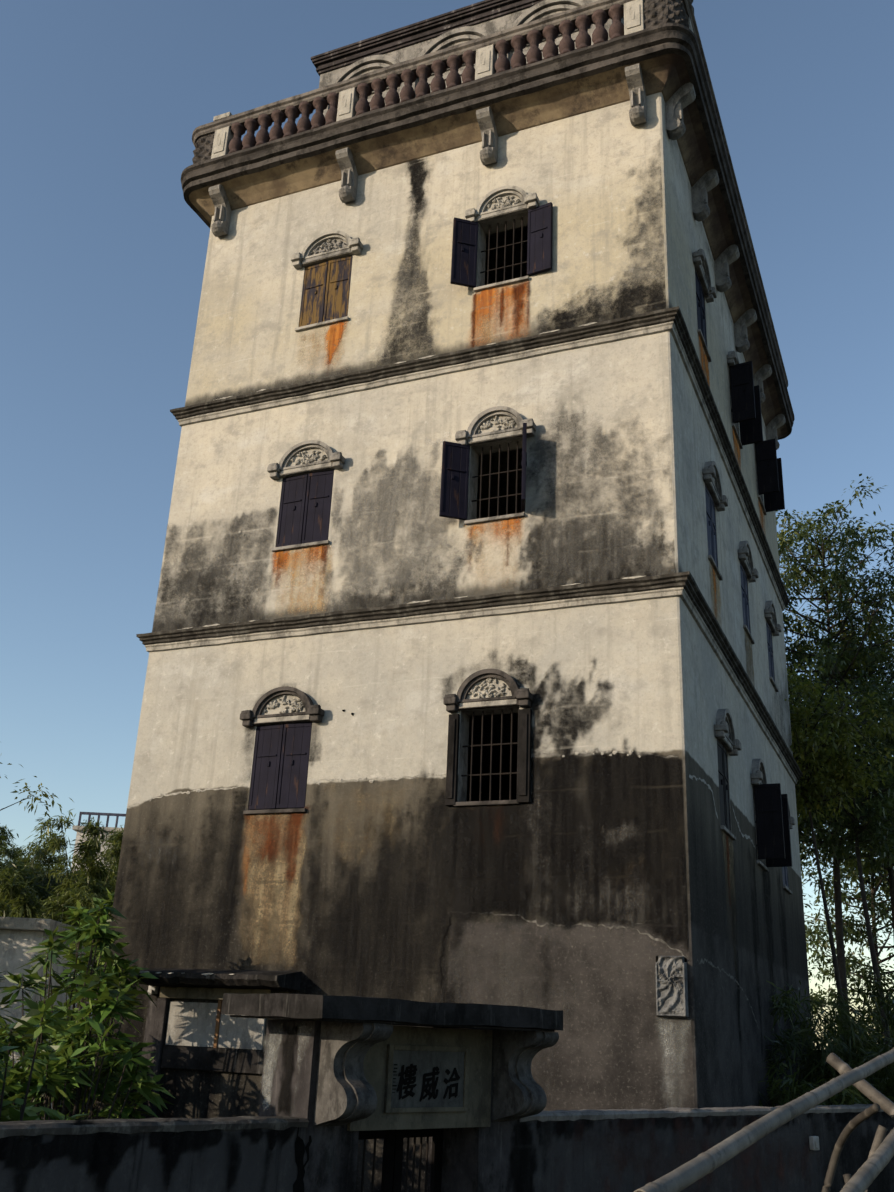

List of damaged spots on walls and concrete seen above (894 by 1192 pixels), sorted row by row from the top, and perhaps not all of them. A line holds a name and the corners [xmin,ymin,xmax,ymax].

corrosion [313,322,344,364]
water stain [381,159,433,363]
corrosion [472,282,530,347]
water stain [537,155,666,335]
water stain [152,508,276,632]
corrosion [273,545,331,610]
corrosion [494,518,523,535]
water stain [519,417,675,591]
corrosion [243,807,307,958]
water stain [299,658,688,1003]
water stain [0,1026,300,1192]
crack [293,1119,312,1192]